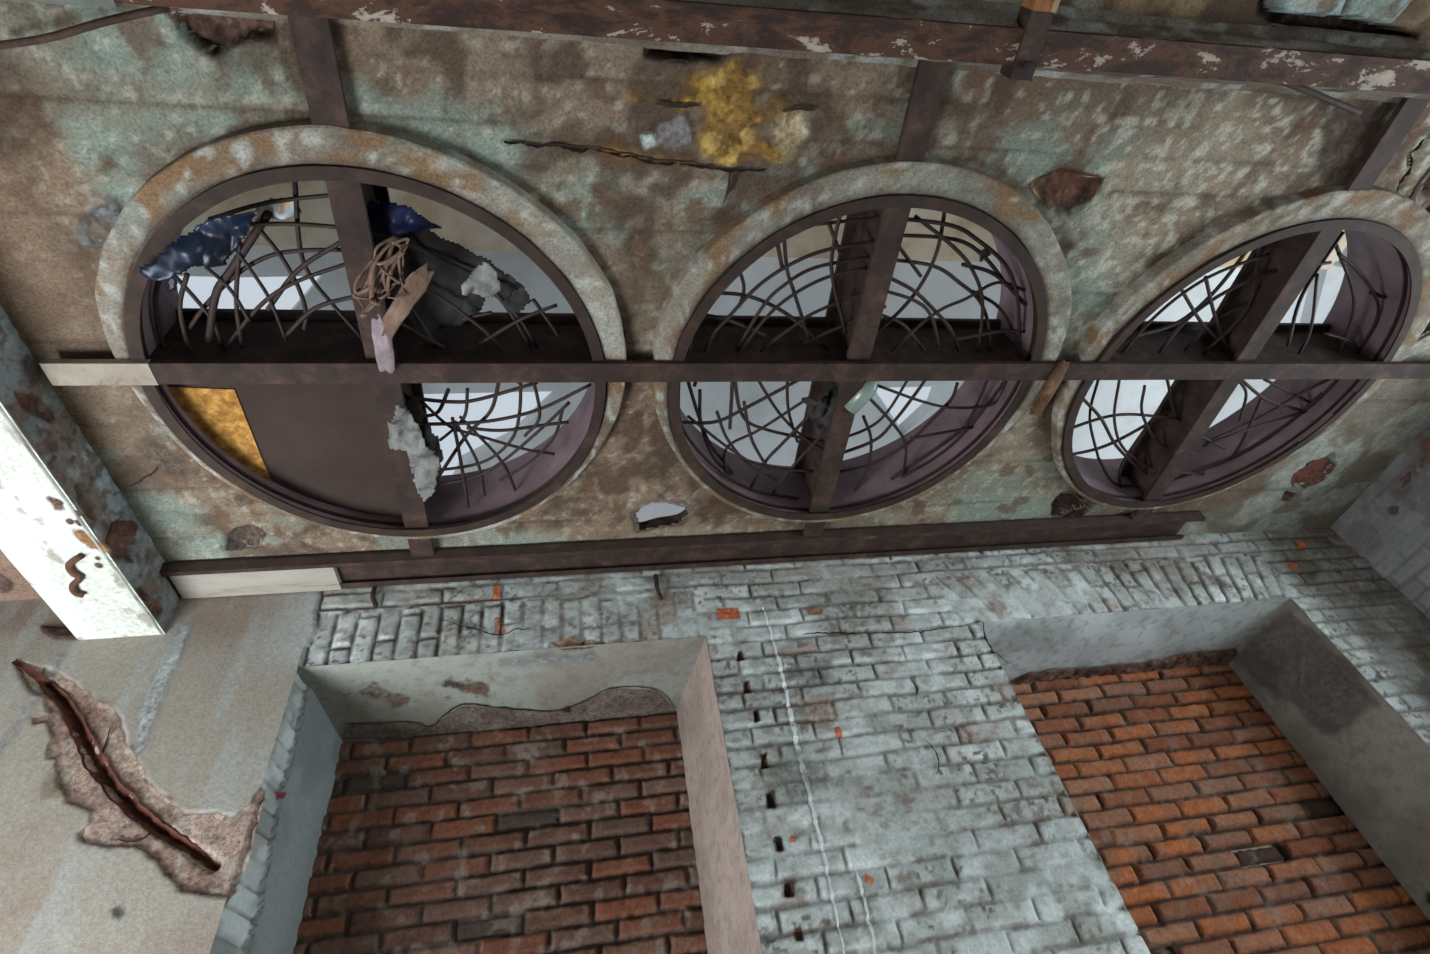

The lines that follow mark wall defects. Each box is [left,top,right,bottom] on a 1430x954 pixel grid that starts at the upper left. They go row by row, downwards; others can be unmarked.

crack [656,101,700,109]
water stain [641,60,807,166]
crack [782,104,815,112]
crack [504,140,766,203]
spalling [1029,169,1103,209]
corrosion [15,393,55,423]
spalling [1281,456,1335,501]
corrosion [47,486,138,568]
corrosion [135,587,163,616]
flaking render [11,659,286,904]